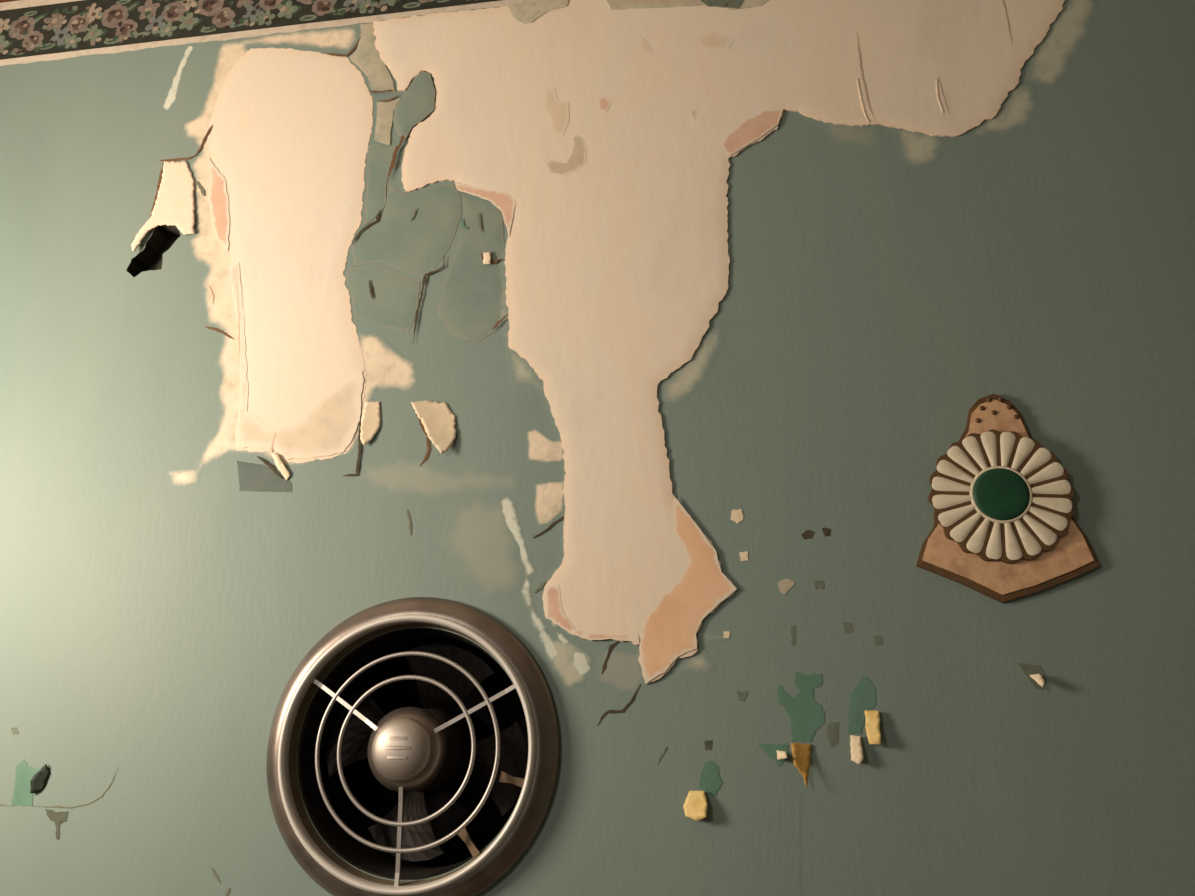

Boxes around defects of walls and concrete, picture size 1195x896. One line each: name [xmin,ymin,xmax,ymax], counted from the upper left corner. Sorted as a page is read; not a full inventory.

peeling [127,0,1098,684]
crack [602,641,619,673]
crack [597,684,641,726]
peeling [758,672,881,787]
peeling [1018,663,1046,690]
peeling [11,759,69,840]
crack [0,770,117,808]
peeling [683,740,722,820]